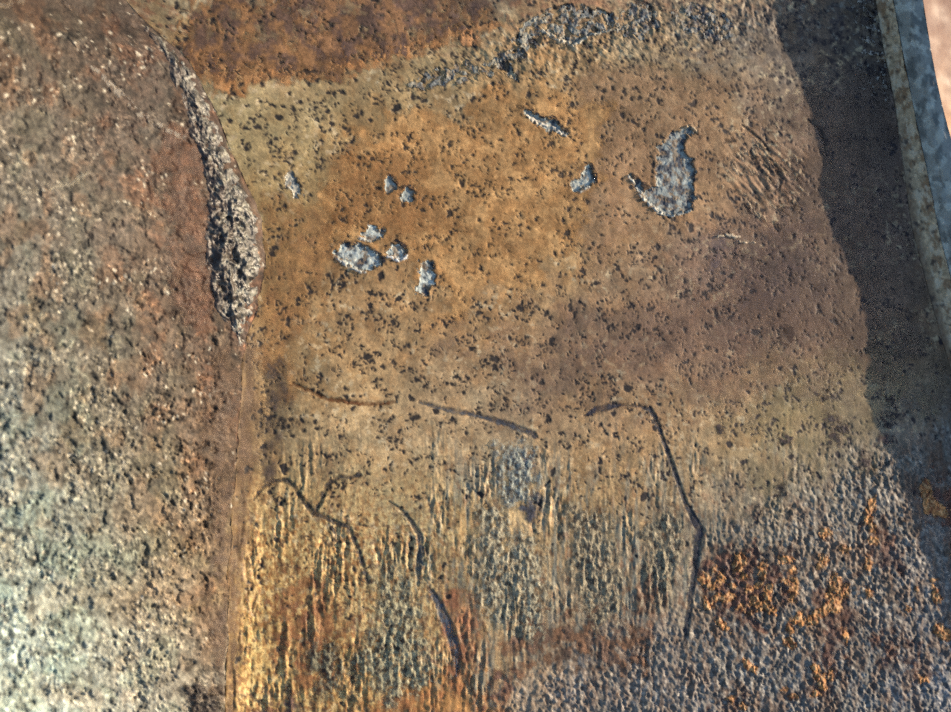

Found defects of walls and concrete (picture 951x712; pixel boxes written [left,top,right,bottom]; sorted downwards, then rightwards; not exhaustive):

peeling [408,3,660,91]
peeling [523,109,569,137]
peeling [628,124,697,218]
peeling [332,224,438,296]
crack [419,401,537,439]
crack [257,472,369,583]
crack [586,403,704,646]
rust [914,466,951,527]
crack [392,504,460,677]
rust [696,495,904,701]
rust [870,629,932,685]
rust [932,623,951,642]